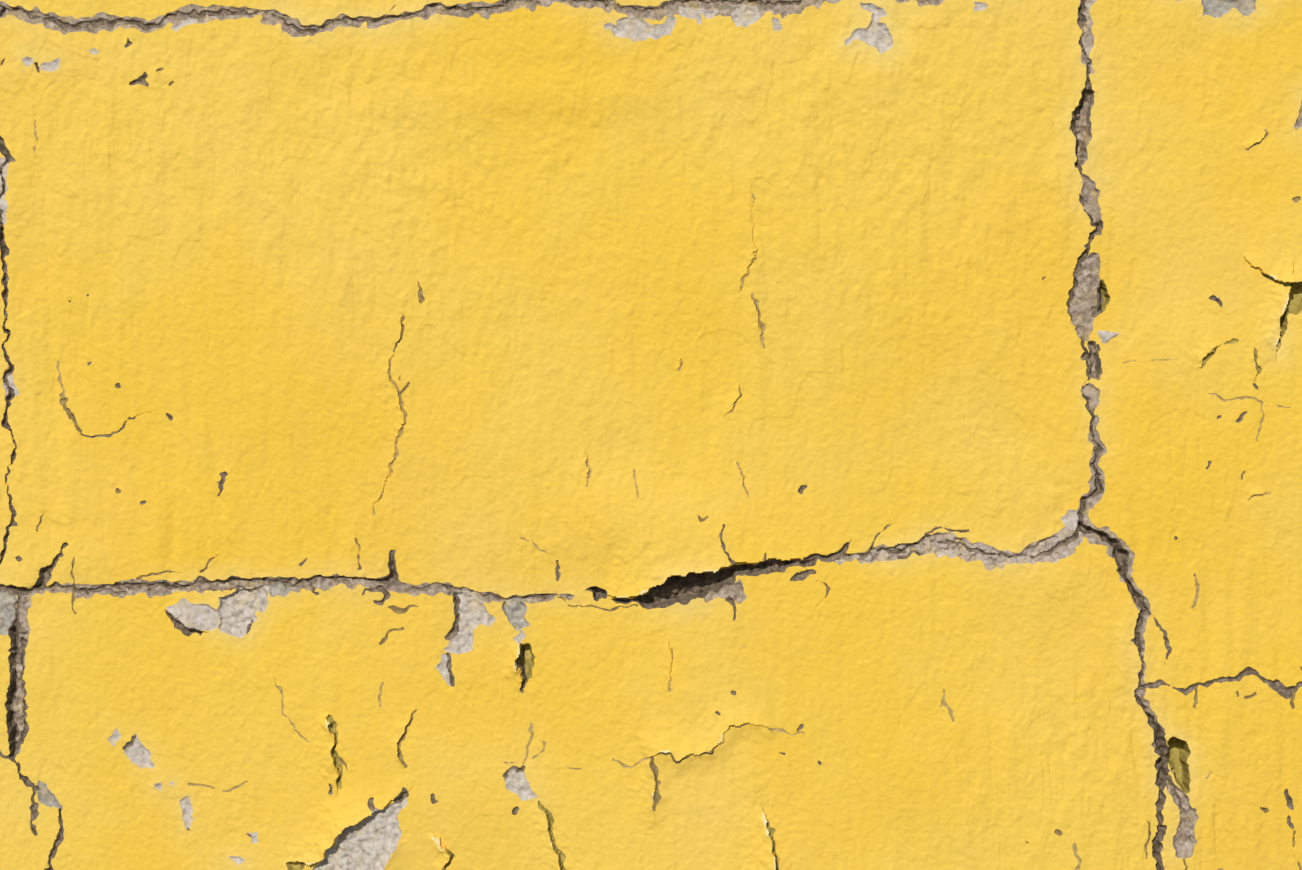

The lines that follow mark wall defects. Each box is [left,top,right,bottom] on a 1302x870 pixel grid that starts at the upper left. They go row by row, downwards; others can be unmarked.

crack [0,0,841,42]
peeling [844,2,893,54]
crack [0,119,38,564]
crack [56,361,136,438]
crack [373,282,425,515]
crack [512,0,1302,870]
peeling [1195,254,1302,390]
spalling [165,582,295,638]
crack [0,537,504,870]
spalling [286,787,410,870]
peeling [503,723,566,870]